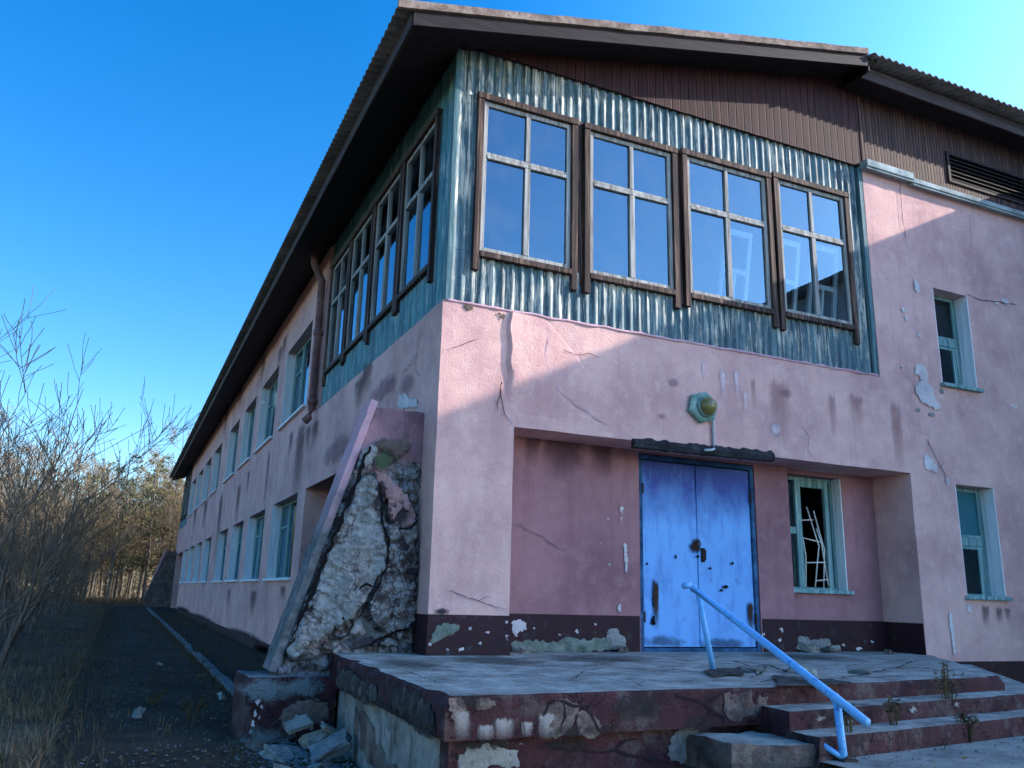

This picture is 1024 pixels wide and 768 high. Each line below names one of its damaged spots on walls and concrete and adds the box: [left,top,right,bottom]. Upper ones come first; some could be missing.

spalling [398,392,419,409]
crack [545,339,608,424]
spalling [901,364,944,417]
spalling [287,437,420,659]
corrosion [690,538,701,552]
spalling [428,623,472,651]
spalling [505,619,627,652]
spalling [278,698,329,725]
spalling [449,697,496,721]
spalling [546,698,602,739]